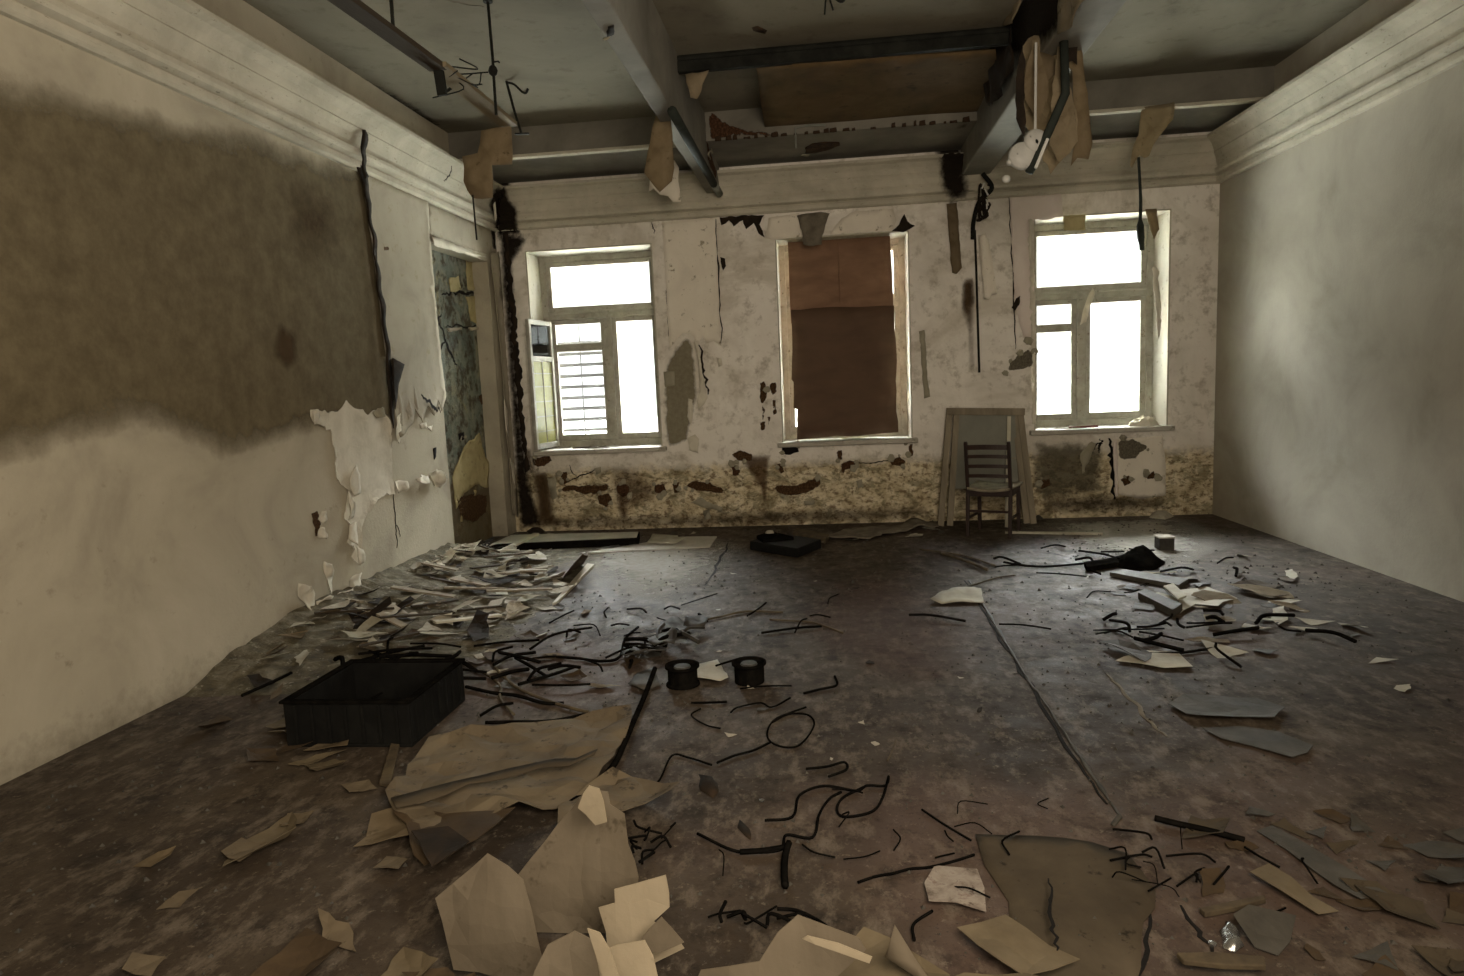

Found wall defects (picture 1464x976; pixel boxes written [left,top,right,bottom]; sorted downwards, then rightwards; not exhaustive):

leakage [0,92,393,447]
flaking render [664,340,699,453]
peeling [298,400,489,610]
flaking render [532,456,632,510]
flaking render [652,450,752,520]
flaking render [772,440,821,505]
flaking render [836,450,864,488]
flaking render [887,443,914,469]
peeling [1114,434,1166,499]